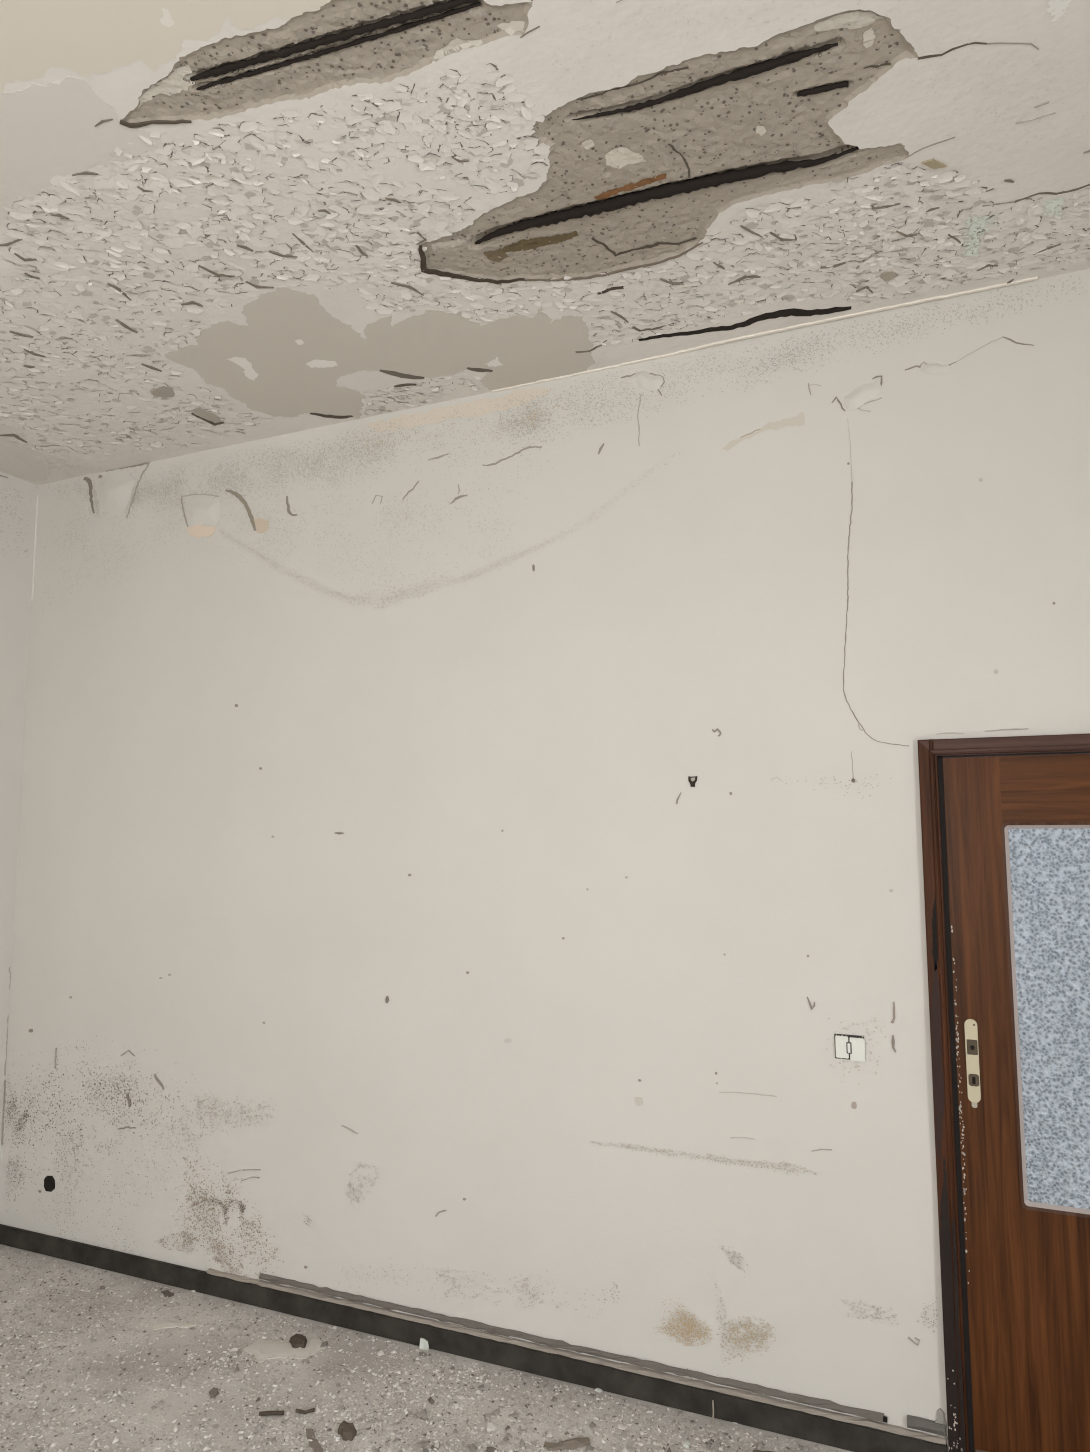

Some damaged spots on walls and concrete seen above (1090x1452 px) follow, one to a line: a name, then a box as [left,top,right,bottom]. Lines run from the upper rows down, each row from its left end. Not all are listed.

spalling [0,0,1090,455]
crack [575,306,851,454]
crack [808,336,1034,778]